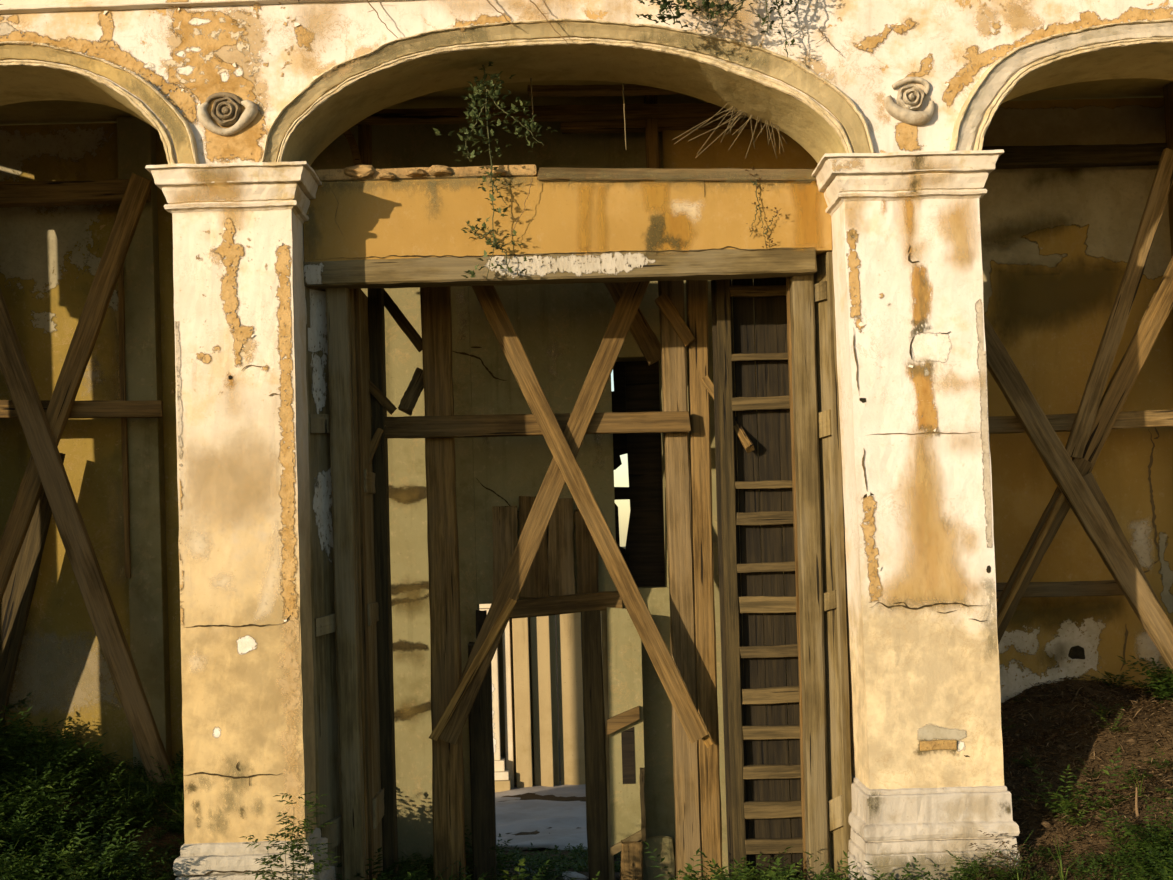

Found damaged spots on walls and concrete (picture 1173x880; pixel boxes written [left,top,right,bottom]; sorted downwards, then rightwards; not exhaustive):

flaking render [0,0,270,163]
flaking render [854,18,919,54]
flaking render [942,0,1173,106]
flaking render [196,209,259,393]
peeling [485,252,656,278]
spalling [175,321,183,516]
flaking render [907,320,952,437]
flaking render [257,240,328,841]
crack [192,615,291,627]
crack [875,602,987,622]
flaking render [998,617,1106,703]
crack [182,762,282,786]